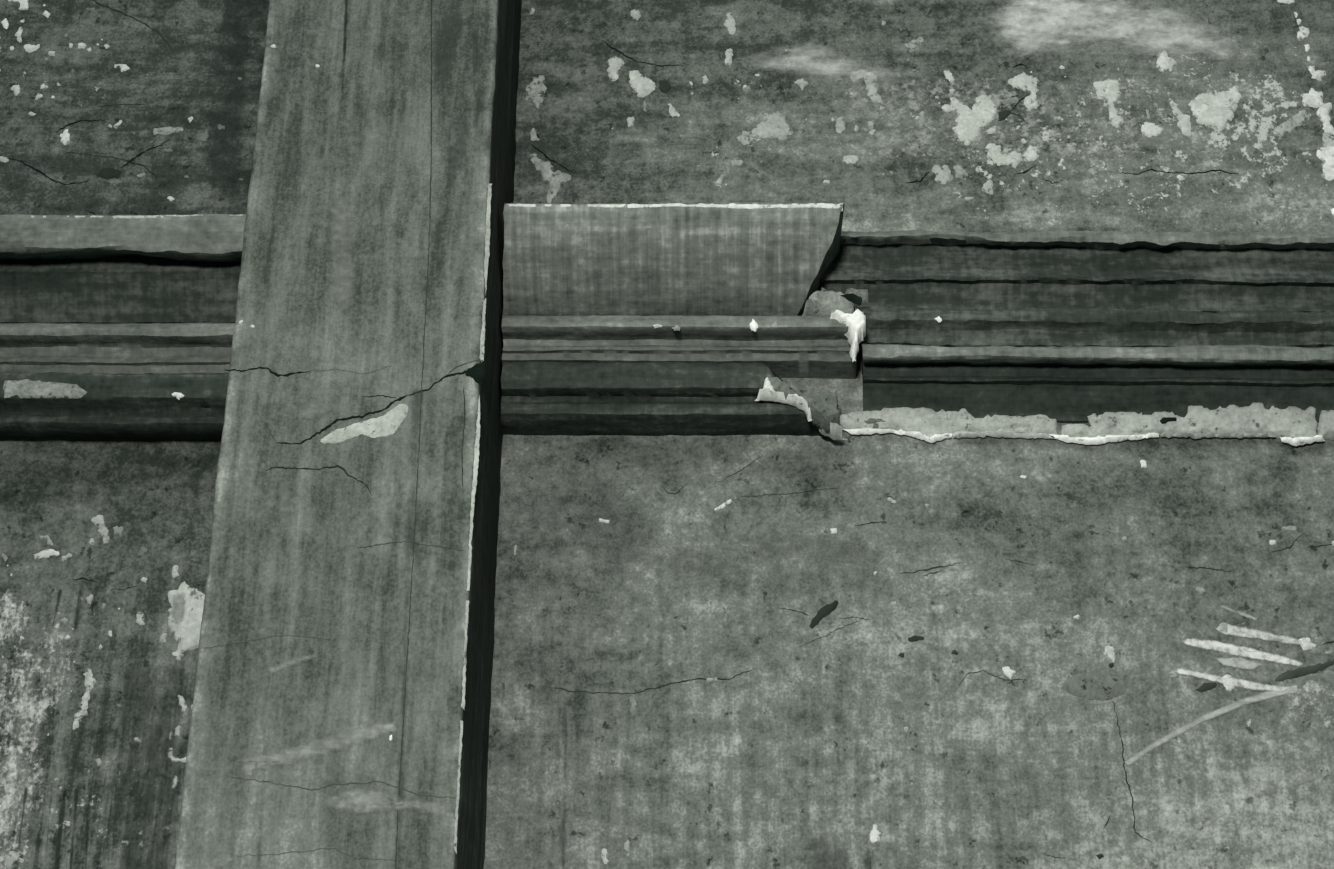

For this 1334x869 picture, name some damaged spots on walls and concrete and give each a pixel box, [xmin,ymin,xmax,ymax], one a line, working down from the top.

peeling [0,0,110,60]
crack [0,104,169,215]
peeling [530,128,571,203]
peeling [606,56,655,127]
peeling [916,65,1135,201]
peeling [1141,86,1242,138]
spalling [802,287,869,362]
crack [225,0,481,869]
spalling [755,374,1334,446]
peeling [160,565,205,660]
spalling [1275,638,1334,682]
peeling [0,594,97,869]